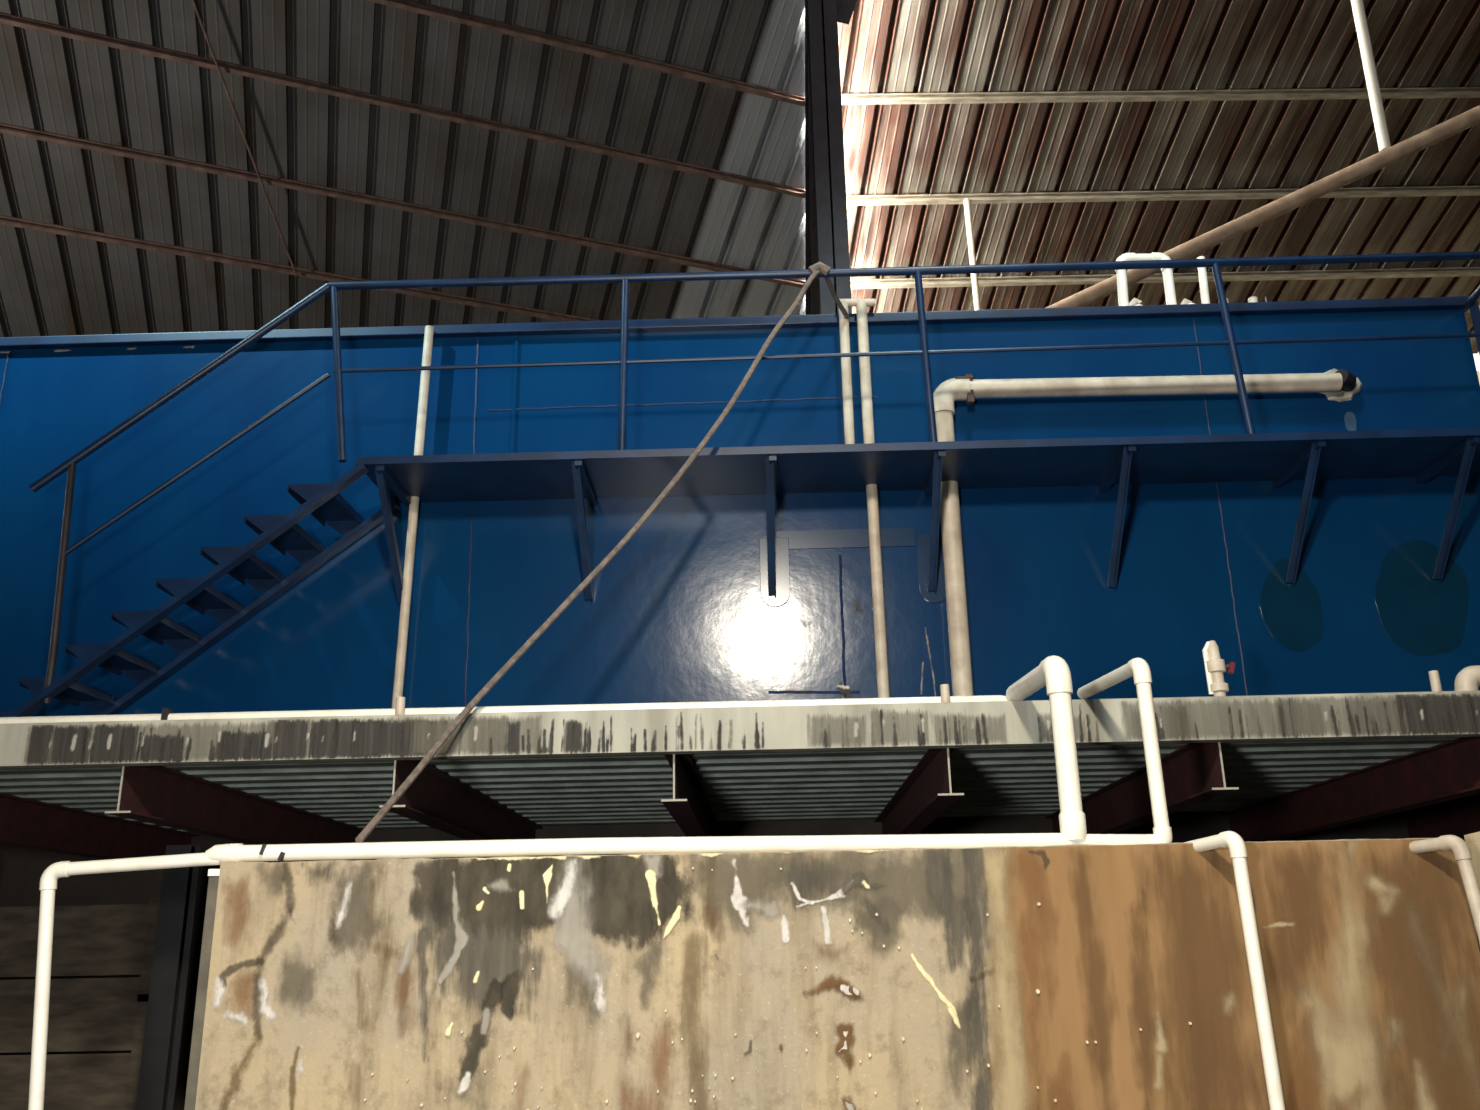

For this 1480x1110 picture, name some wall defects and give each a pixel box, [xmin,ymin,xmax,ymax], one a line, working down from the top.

leakage [26,717,612,765]
leakage [630,716,764,752]
leakage [812,710,1005,747]
leakage [1037,714,1053,739]
leakage [1074,710,1099,742]
leakage [1122,693,1480,740]
peeling [543,866,552,898]
crack [219,862,293,1110]
leakage [398,848,1026,1110]
rust [994,839,1480,1110]
crack [290,1048,299,1110]